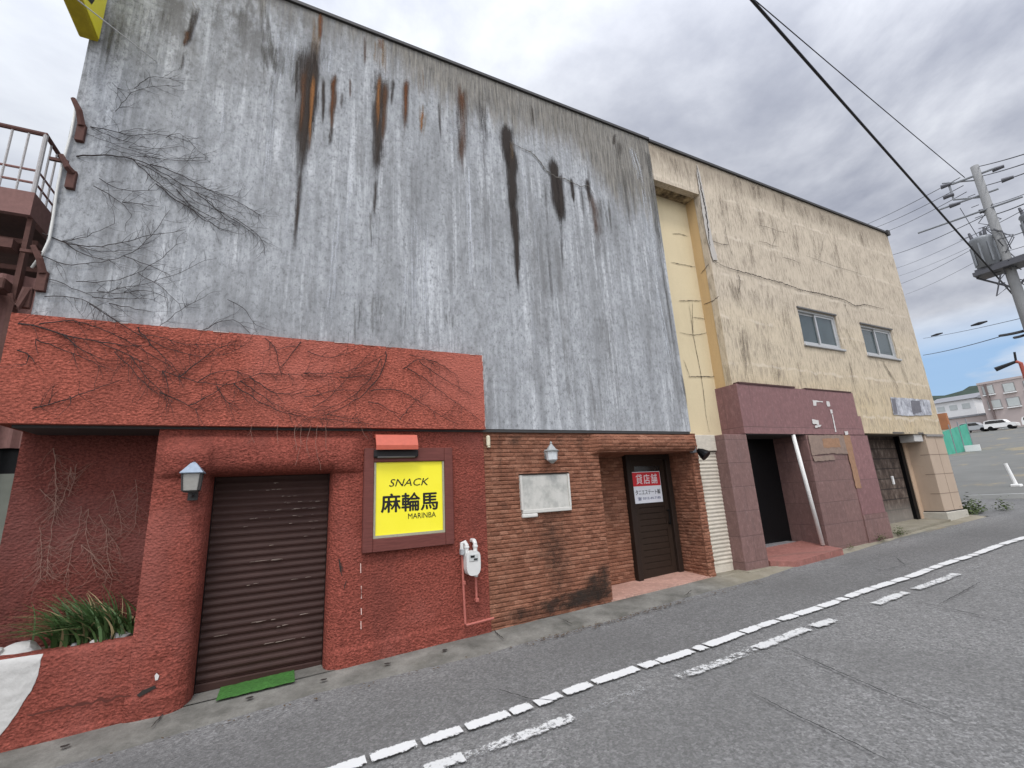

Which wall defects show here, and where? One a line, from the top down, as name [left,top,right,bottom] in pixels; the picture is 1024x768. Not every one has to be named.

corrosion [294,14,351,241]
corrosion [364,40,408,166]
water stain [501,124,520,284]
crack [509,141,594,194]
water stain [545,158,611,262]
crack [672,165,883,428]
peeling [808,400,862,488]
water stain [541,565,610,613]